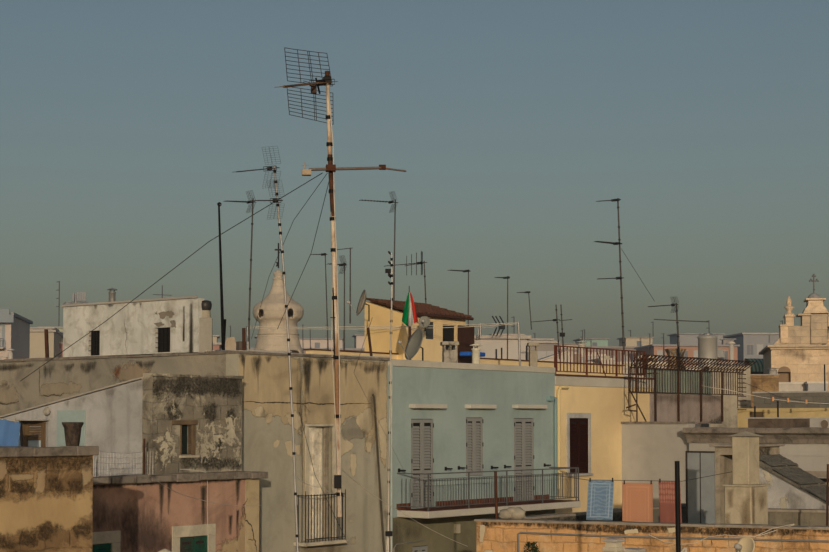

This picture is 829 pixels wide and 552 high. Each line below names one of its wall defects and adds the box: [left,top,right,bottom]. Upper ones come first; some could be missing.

damp [304,359,327,384]
mould [153,377,240,419]
peeling [153,394,183,472]
mould [183,434,242,470]
peeling [196,355,387,496]
damp [0,456,93,497]
damp [0,525,58,548]
damp [73,508,186,552]
crack [242,498,257,552]